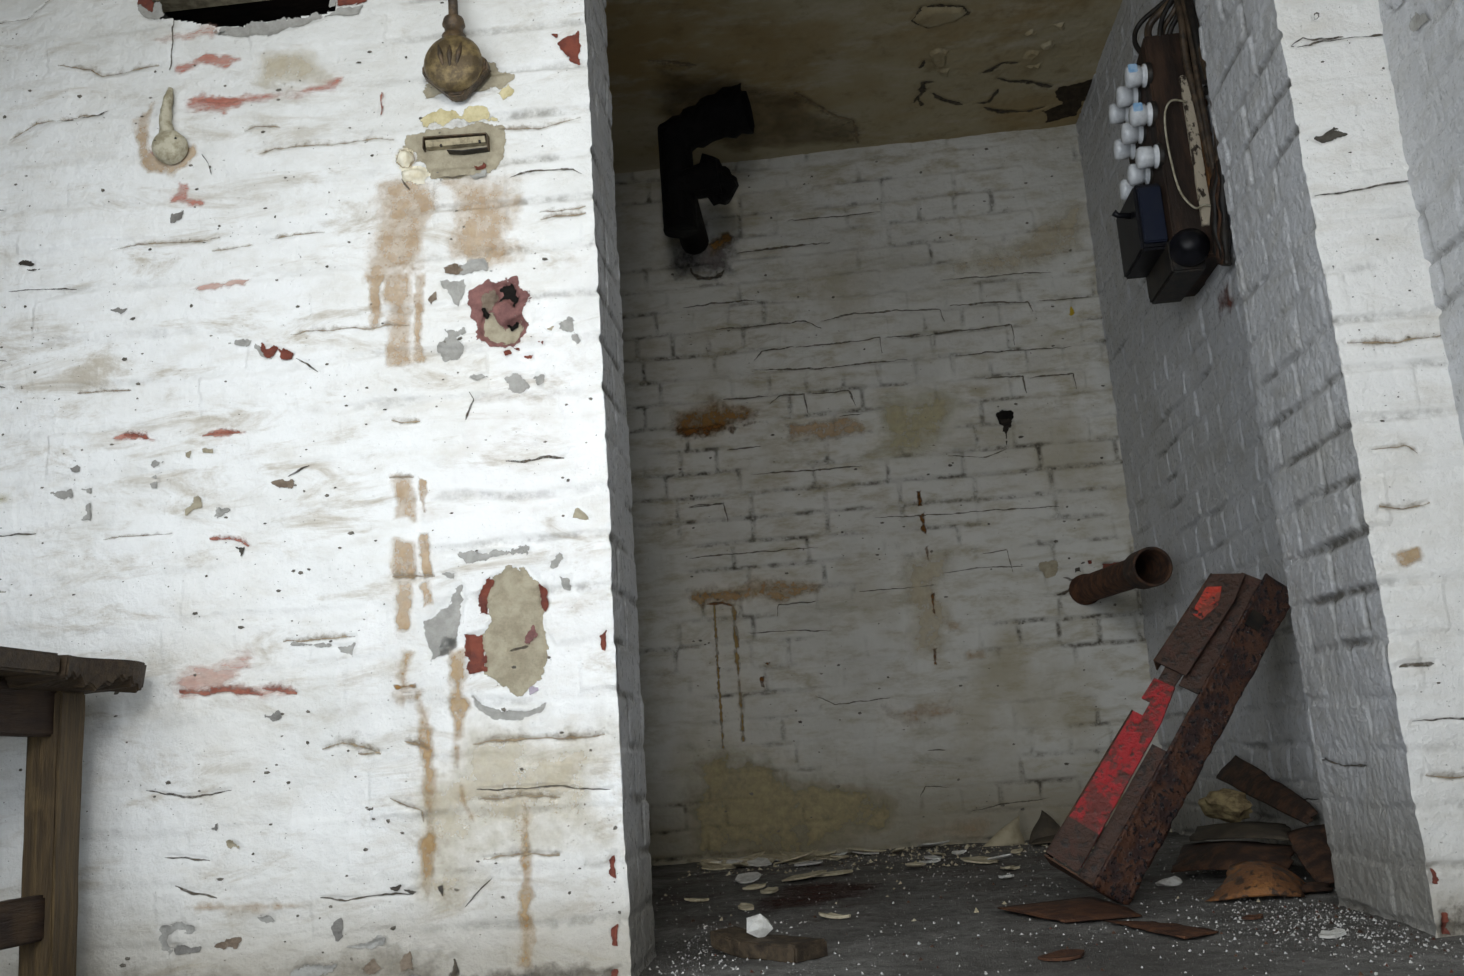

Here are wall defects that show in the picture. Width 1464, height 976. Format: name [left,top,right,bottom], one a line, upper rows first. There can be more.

spalling [137,0,367,37]
flaking render [1042,79,1092,123]
spalling [428,258,532,362]
peeling [547,316,581,344]
peeling [469,373,545,393]
corrosion [677,403,750,437]
peeling [423,545,530,665]
corrosion [691,581,814,748]
crack [1399,661,1434,669]
crack [1415,715,1464,723]
crack [1425,773,1464,781]
water stain [696,754,890,852]